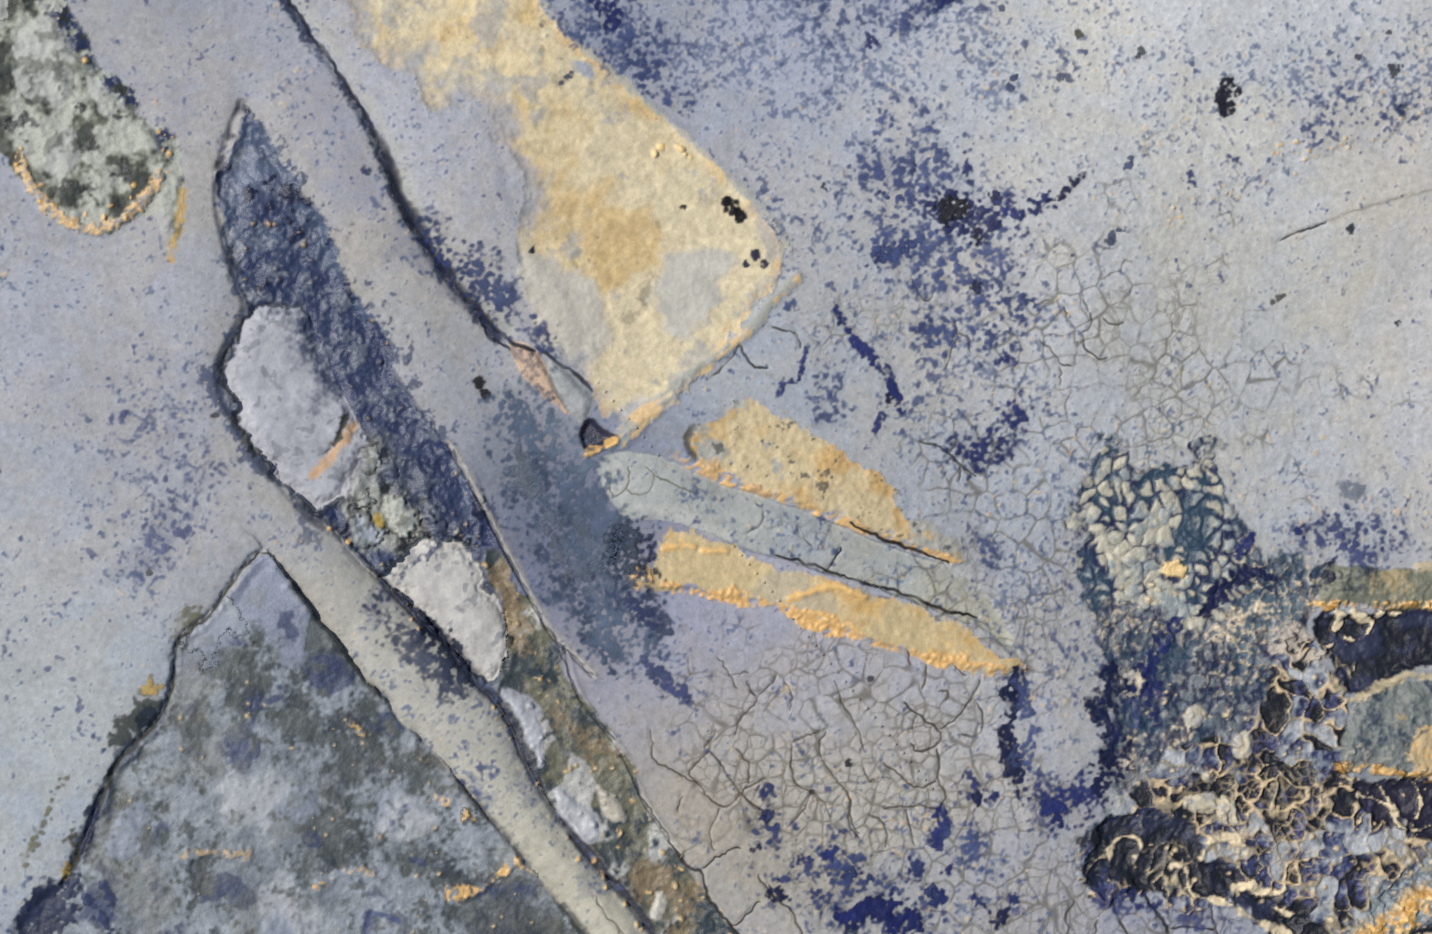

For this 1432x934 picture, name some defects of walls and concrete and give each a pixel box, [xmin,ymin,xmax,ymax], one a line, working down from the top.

flaking render [0,0,187,243]
crack [714,346,767,375]
crack [912,279,970,357]
crack [1028,299,1123,378]
flaking render [210,104,737,934]
crack [486,516,522,584]
crack [616,467,692,496]
crack [750,517,977,618]
crack [919,441,975,480]
flaking render [11,554,585,934]
crack [639,651,983,934]
crack [1064,879,1218,934]